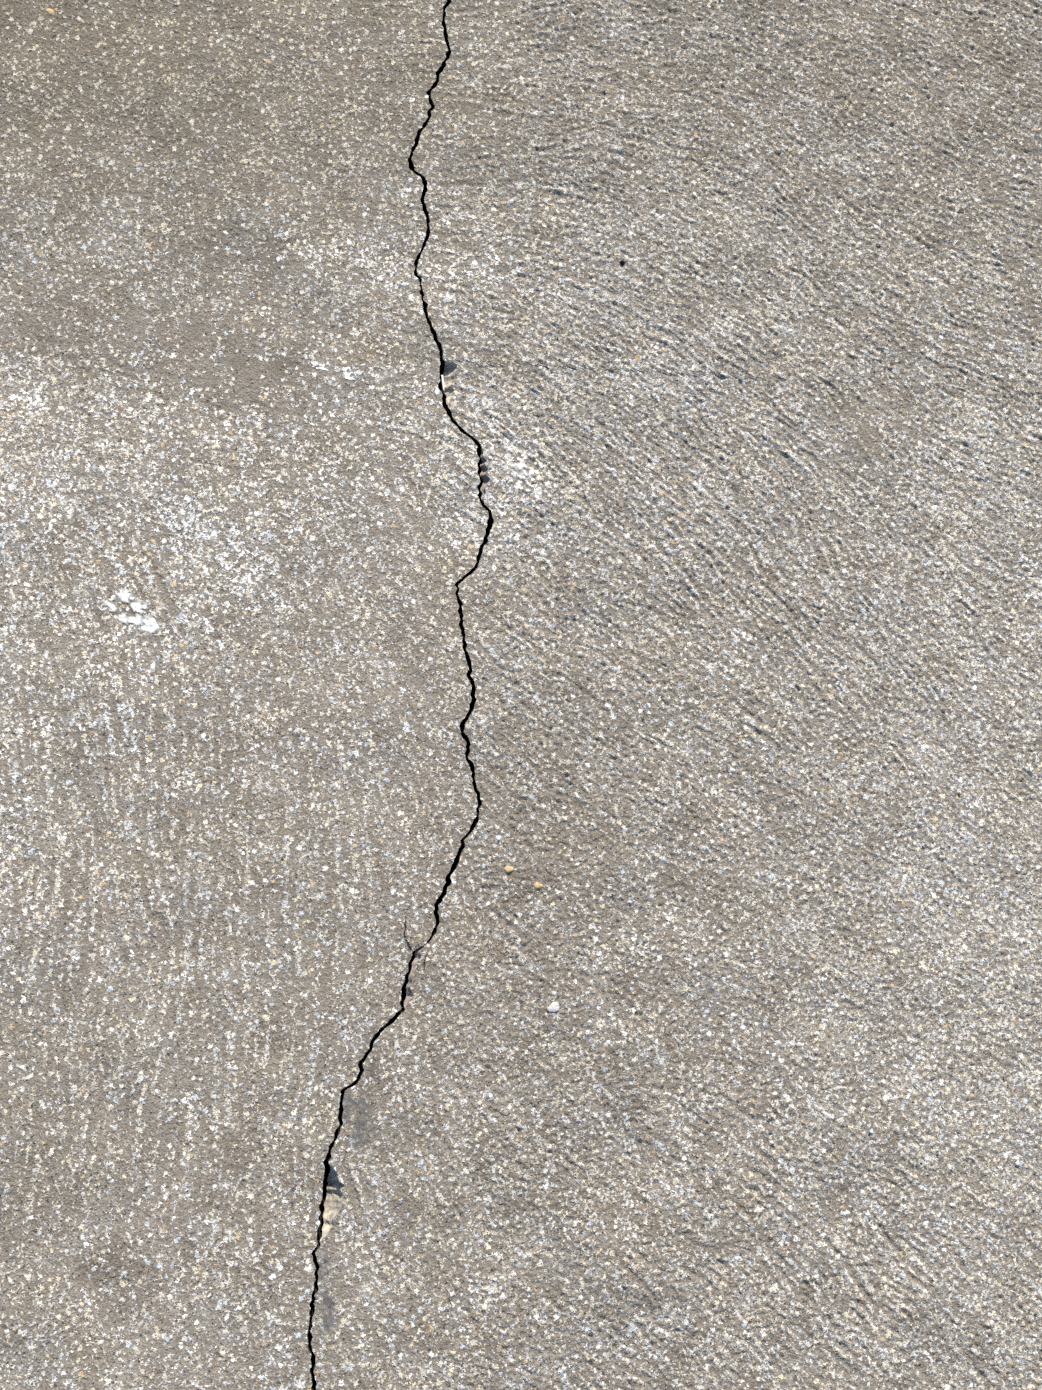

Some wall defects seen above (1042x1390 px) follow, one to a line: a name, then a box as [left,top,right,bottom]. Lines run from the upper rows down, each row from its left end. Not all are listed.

crack [307,0,494,1390]